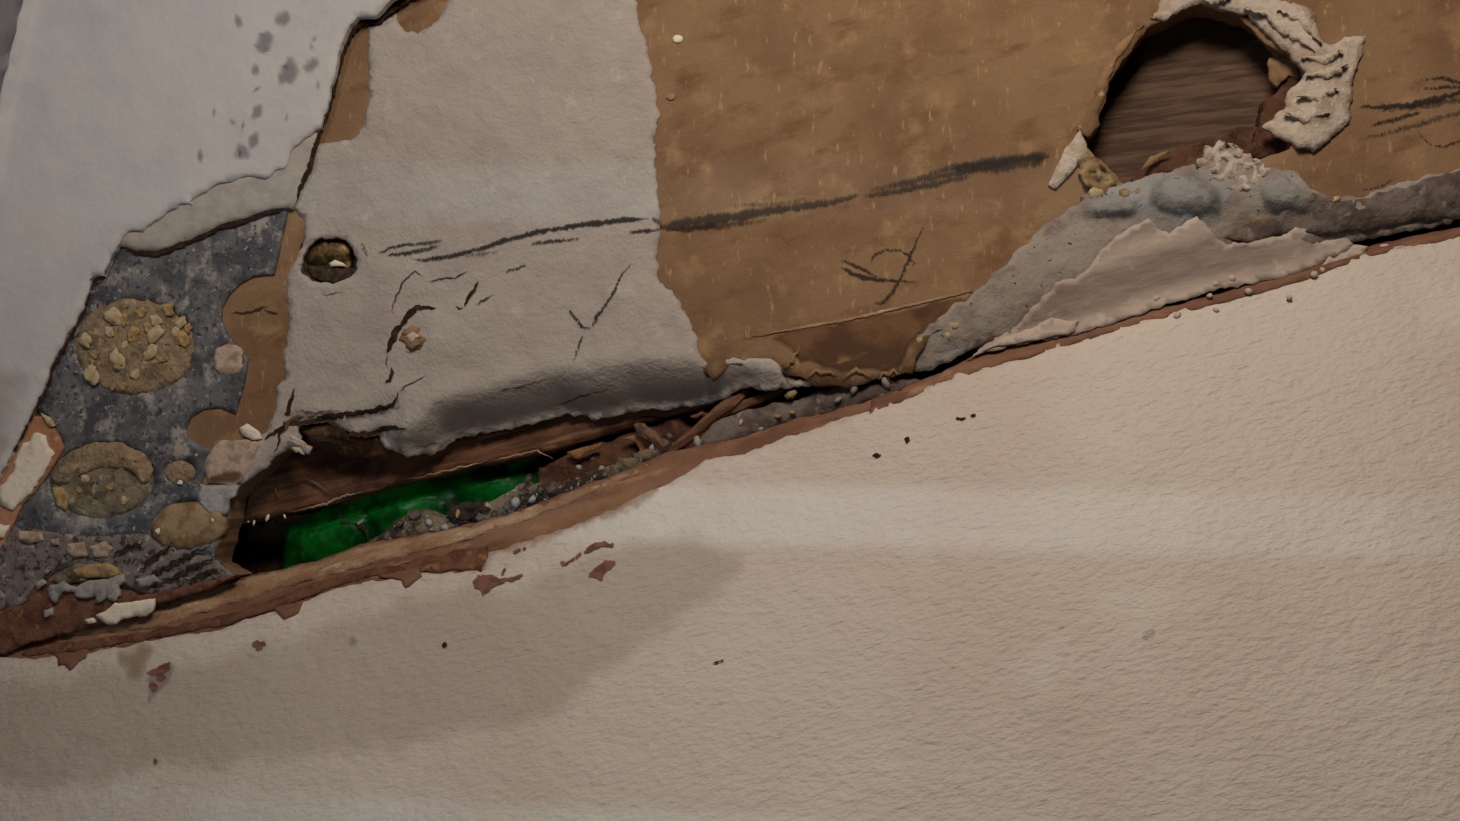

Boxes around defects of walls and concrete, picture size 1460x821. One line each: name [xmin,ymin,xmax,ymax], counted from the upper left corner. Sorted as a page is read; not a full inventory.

water stain [238,13,288,154]
water stain [280,58,316,80]
spalling [1048,0,1366,194]
crack [265,271,492,451]
crack [489,380,606,404]
flaking render [0,216,1460,671]
peeling [146,662,170,691]